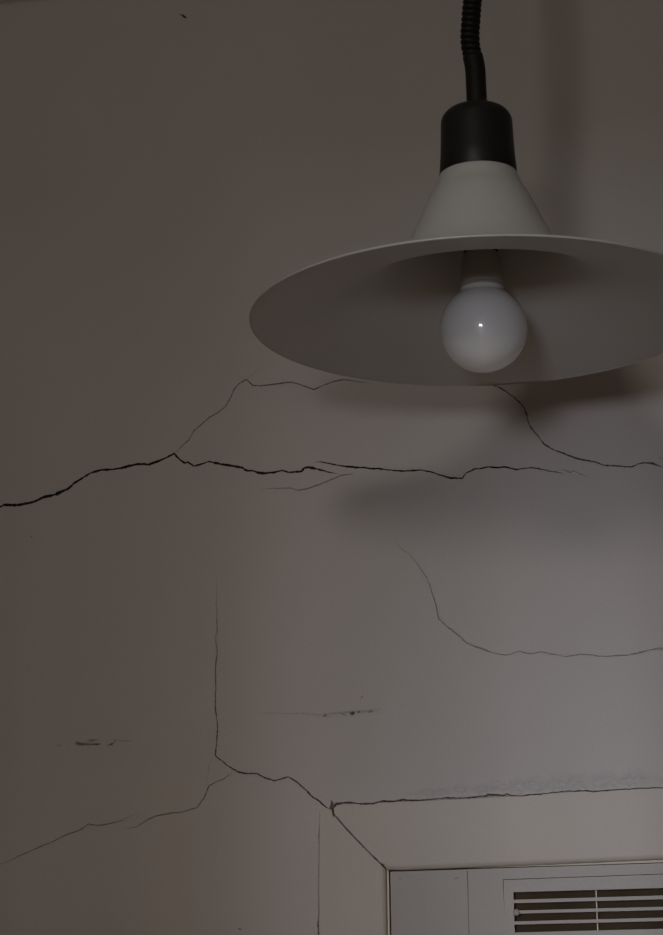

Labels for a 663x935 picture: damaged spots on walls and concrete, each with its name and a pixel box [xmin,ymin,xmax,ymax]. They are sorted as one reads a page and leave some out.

crack [0,379,659,511]
crack [11,630,662,869]